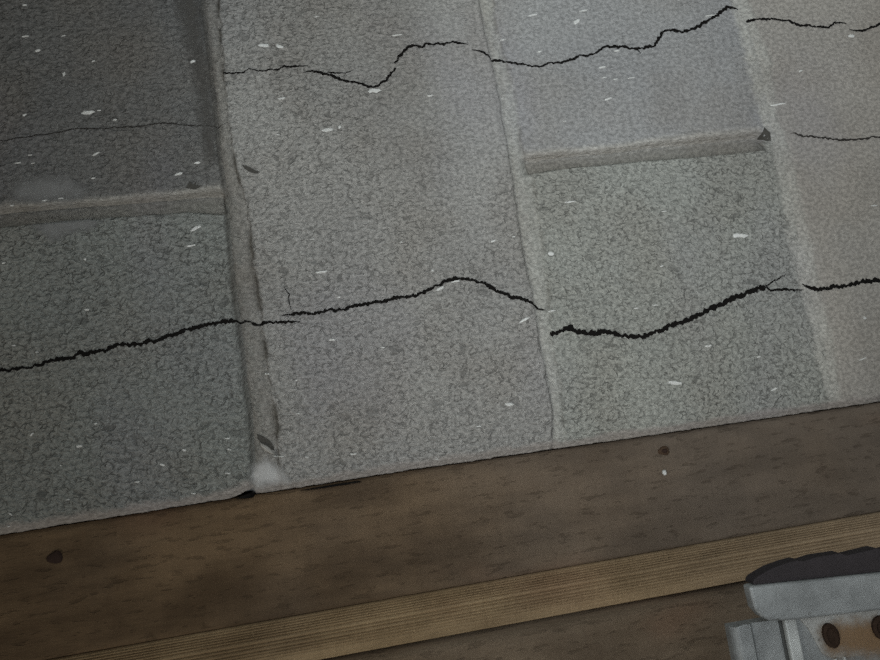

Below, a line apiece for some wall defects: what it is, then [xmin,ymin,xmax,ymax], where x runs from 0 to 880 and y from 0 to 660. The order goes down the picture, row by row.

crack [223,5,880,88]
crack [794,132,880,141]
crack [0,276,546,373]
crack [550,274,880,341]
spalling [257,434,274,454]